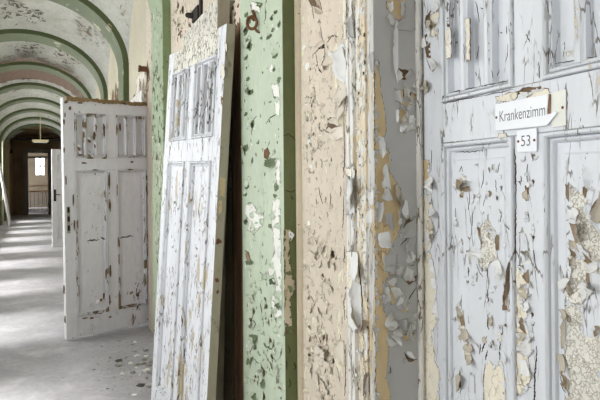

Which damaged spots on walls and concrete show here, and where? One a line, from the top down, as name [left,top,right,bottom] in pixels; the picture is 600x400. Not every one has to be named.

peeling [136,60,165,143]
peeling [173,0,191,41]
peeling [386,0,452,134]
peeling [302,0,440,400]
peeling [557,182,600,400]